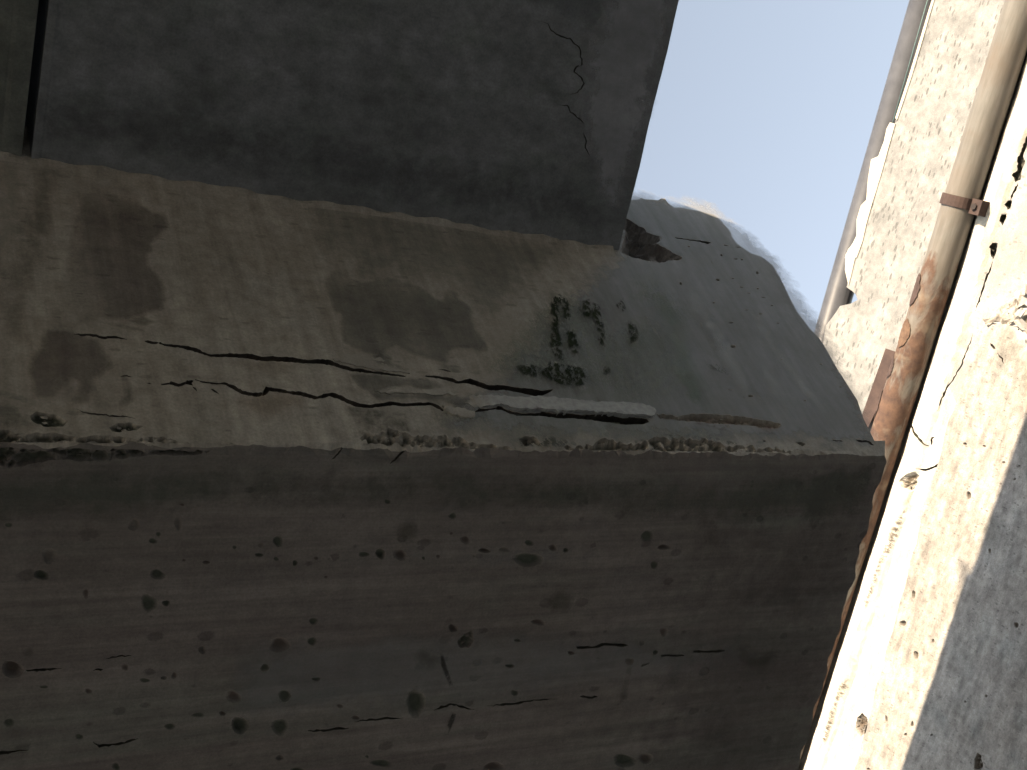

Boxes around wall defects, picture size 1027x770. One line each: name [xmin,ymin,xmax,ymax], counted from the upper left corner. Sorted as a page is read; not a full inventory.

crack [537,20,589,154]
leakage [587,0,667,203]
peeling [845,0,935,285]
spalling [621,219,682,263]
crack [976,136,1027,308]
leakage [453,195,868,446]
spalling [983,288,1027,331]
crack [75,333,649,425]
crack [937,335,1004,411]
spalling [0,411,247,470]
crack [911,423,938,471]